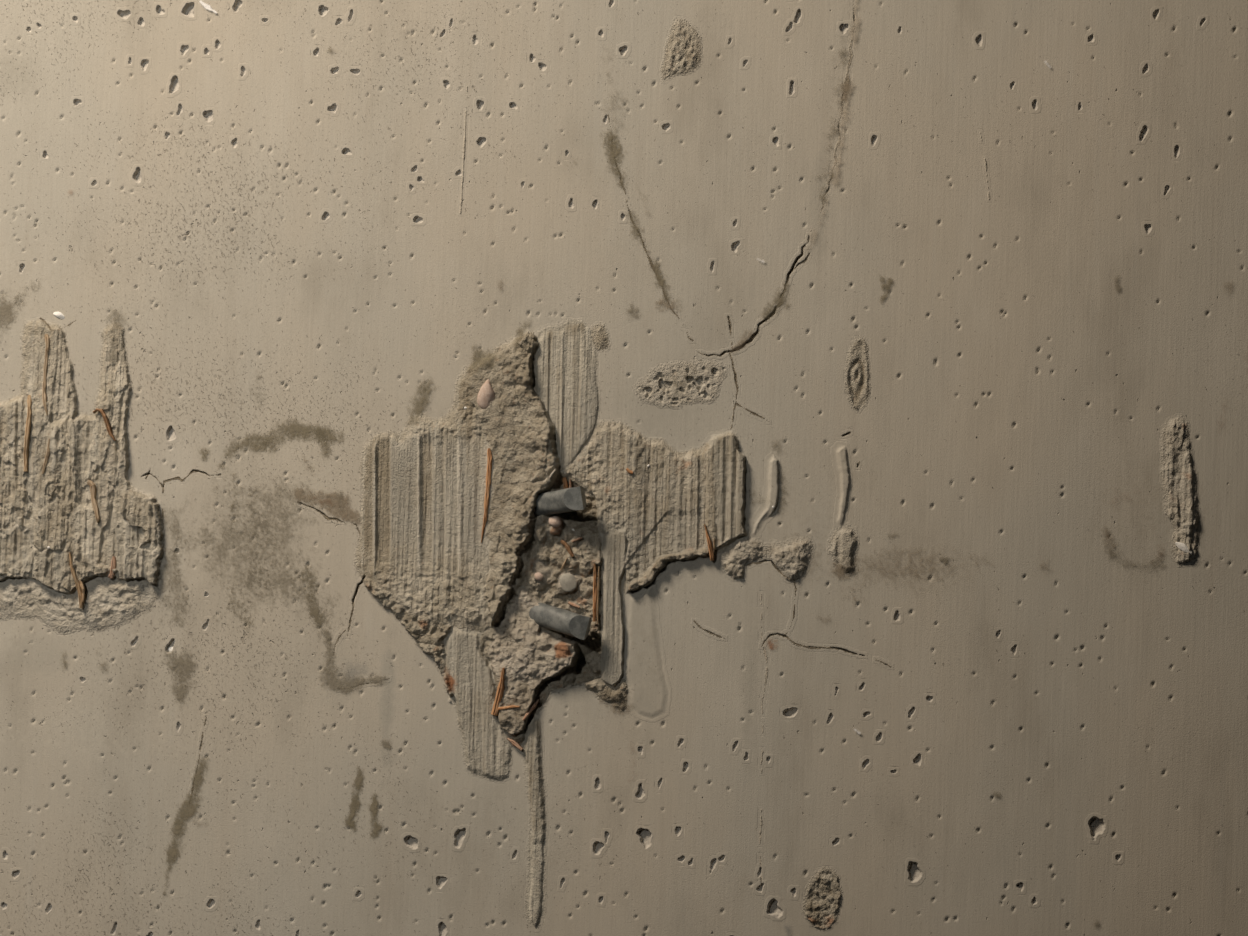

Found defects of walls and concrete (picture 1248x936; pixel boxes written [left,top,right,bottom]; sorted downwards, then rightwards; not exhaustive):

crack [607,0,860,429]
spalling [632,359,730,410]
crack [839,429,863,470]
spalling [479,471,602,748]
crack [690,617,728,642]
crack [747,560,895,670]